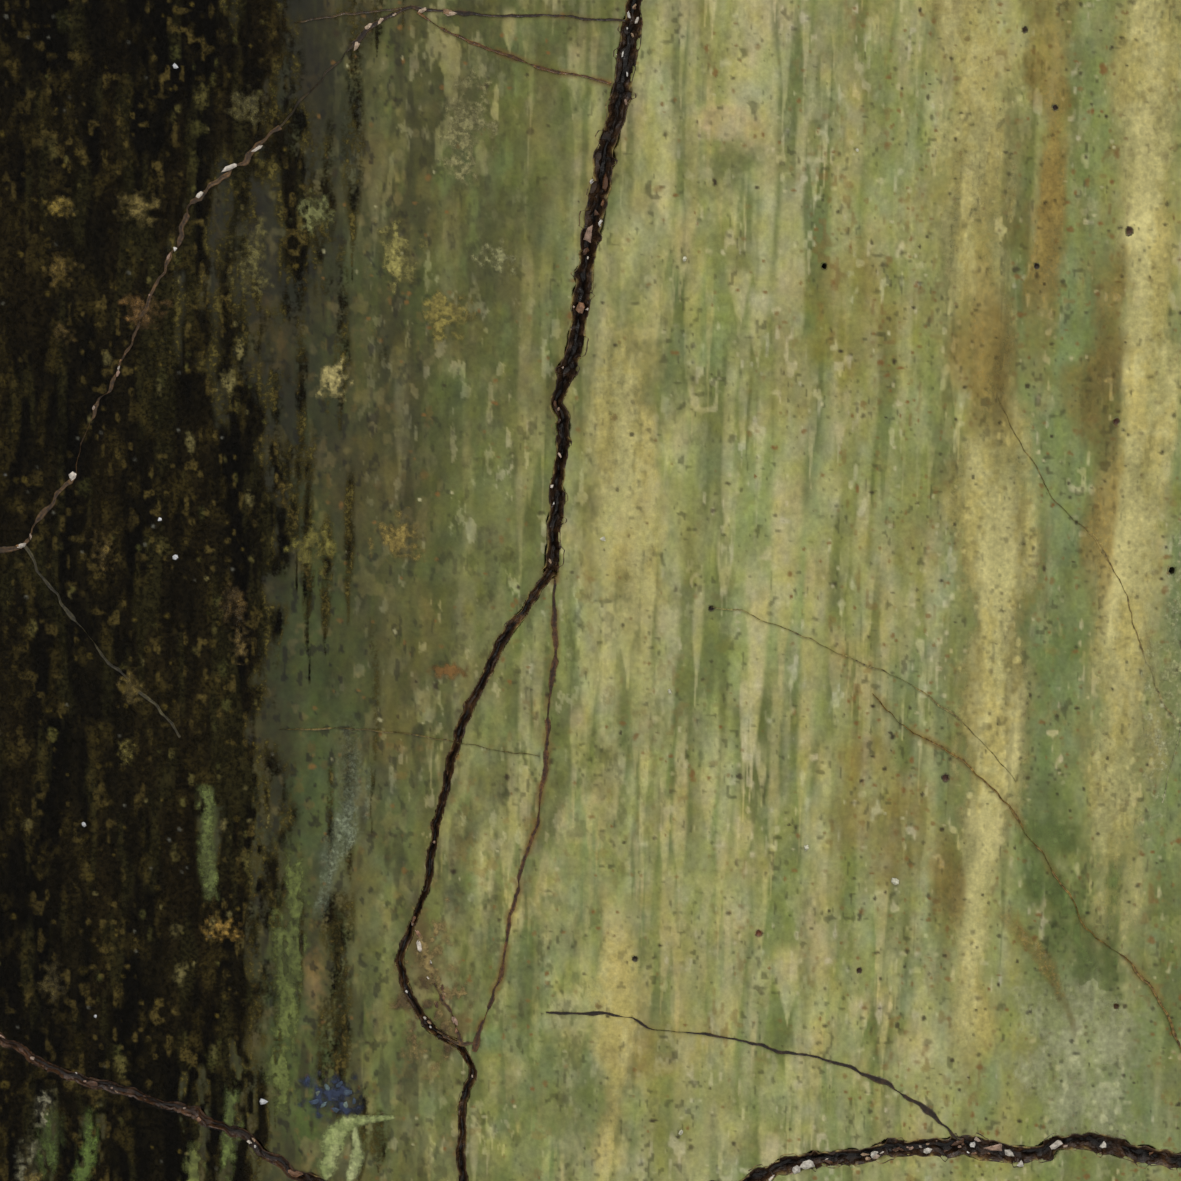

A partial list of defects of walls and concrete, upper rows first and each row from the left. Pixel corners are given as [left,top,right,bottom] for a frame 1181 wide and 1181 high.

water stain [0,0,387,1181]
crack [0,0,643,1181]
crack [998,398,1181,803]
crack [713,607,1181,1050]
crack [546,1010,1181,1181]